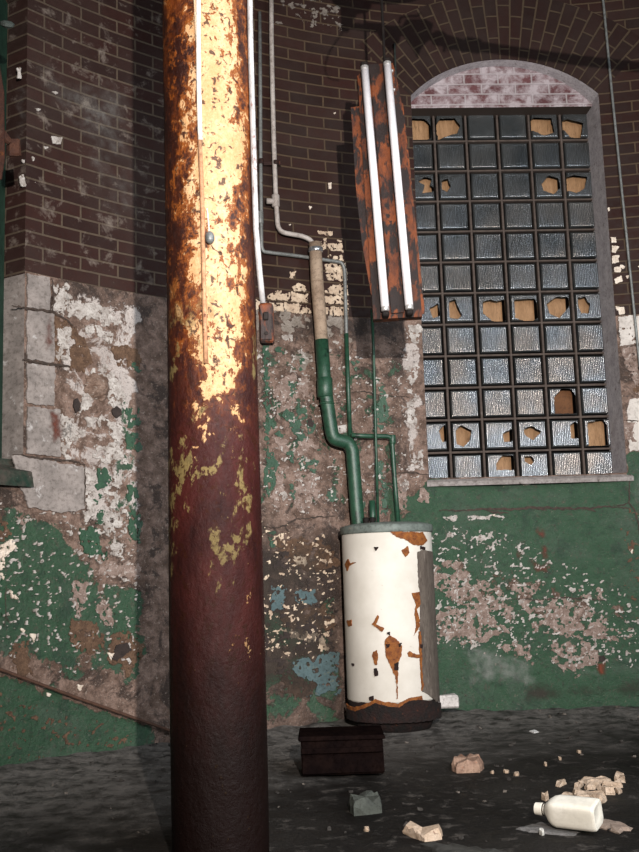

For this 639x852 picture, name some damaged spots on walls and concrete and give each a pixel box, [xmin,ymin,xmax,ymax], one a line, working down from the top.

peeling [611,237,629,284]
spalling [317,230,430,515]
peeling [262,524,342,698]
peeling [432,514,639,678]